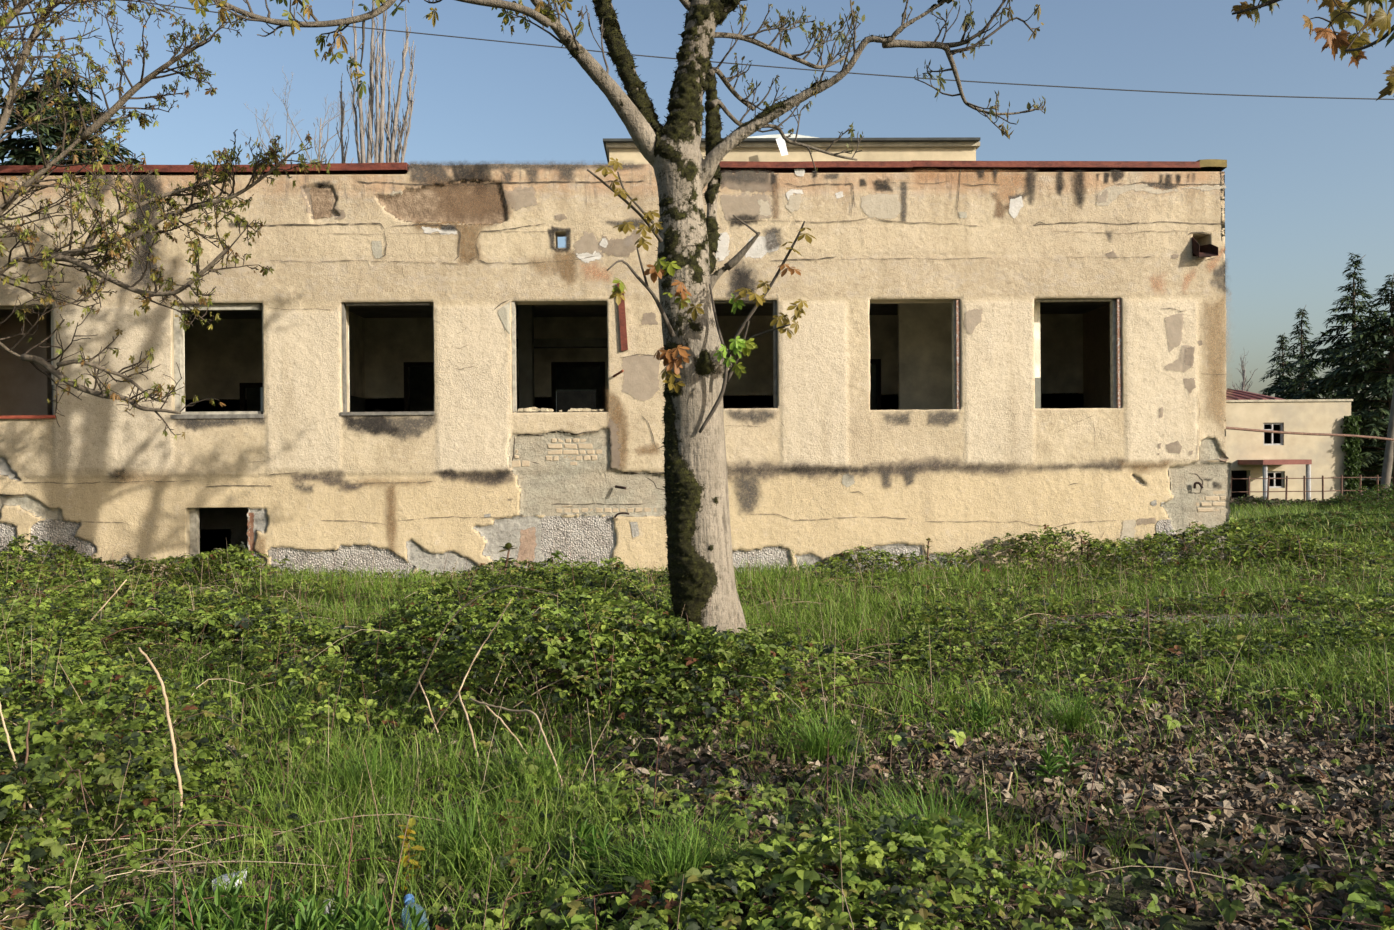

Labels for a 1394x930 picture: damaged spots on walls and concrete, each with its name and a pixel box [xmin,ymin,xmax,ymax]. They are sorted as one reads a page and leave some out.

spalling [375,179,537,262]
peeling [715,169,805,261]
water stain [977,170,1036,218]
water stain [1057,168,1124,204]
peeling [1161,308,1203,393]
water stain [346,415,435,437]
spalling [0,457,97,566]
water stain [294,472,371,491]
spalling [247,428,667,578]
water stain [441,470,512,485]
water stain [727,460,1015,512]
spalling [1120,437,1231,565]